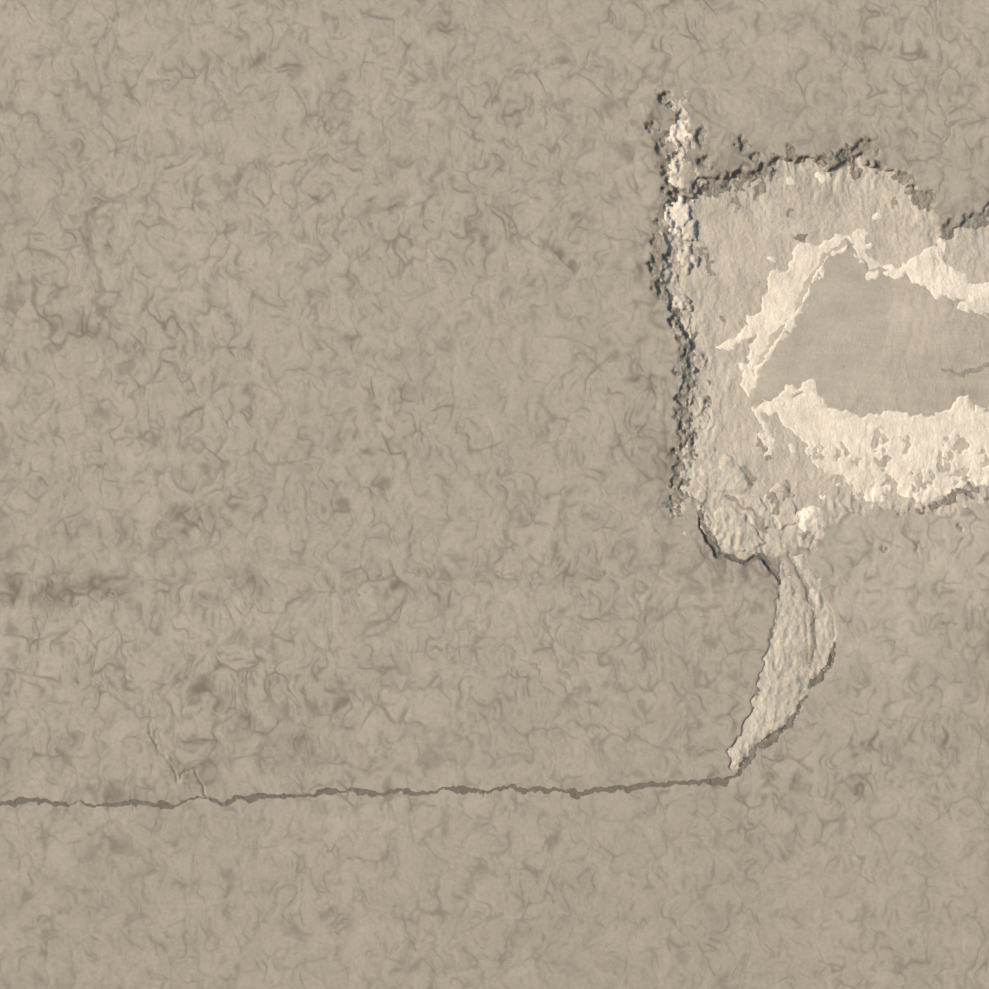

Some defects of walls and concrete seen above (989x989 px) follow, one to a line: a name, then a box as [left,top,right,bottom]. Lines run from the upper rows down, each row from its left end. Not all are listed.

crack [0,731,752,809]
spalling [664,133,989,772]